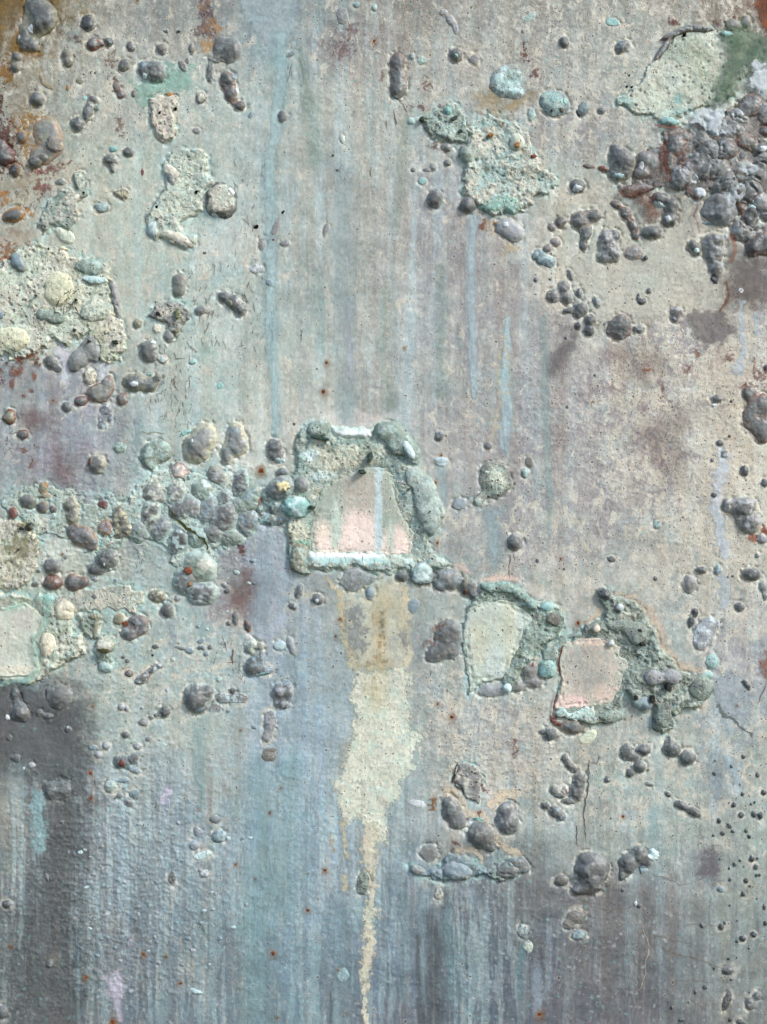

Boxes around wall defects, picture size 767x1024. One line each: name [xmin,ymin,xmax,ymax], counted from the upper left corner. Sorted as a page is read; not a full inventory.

peeling [128,62,214,250]
corrosion [190,0,223,53]
peeling [616,23,767,126]
peeling [0,187,127,364]
peeling [266,420,713,744]
water stain [28,790,50,855]
peeling [0,592,94,1024]
water stain [324,575,423,1024]
crack [576,757,600,845]